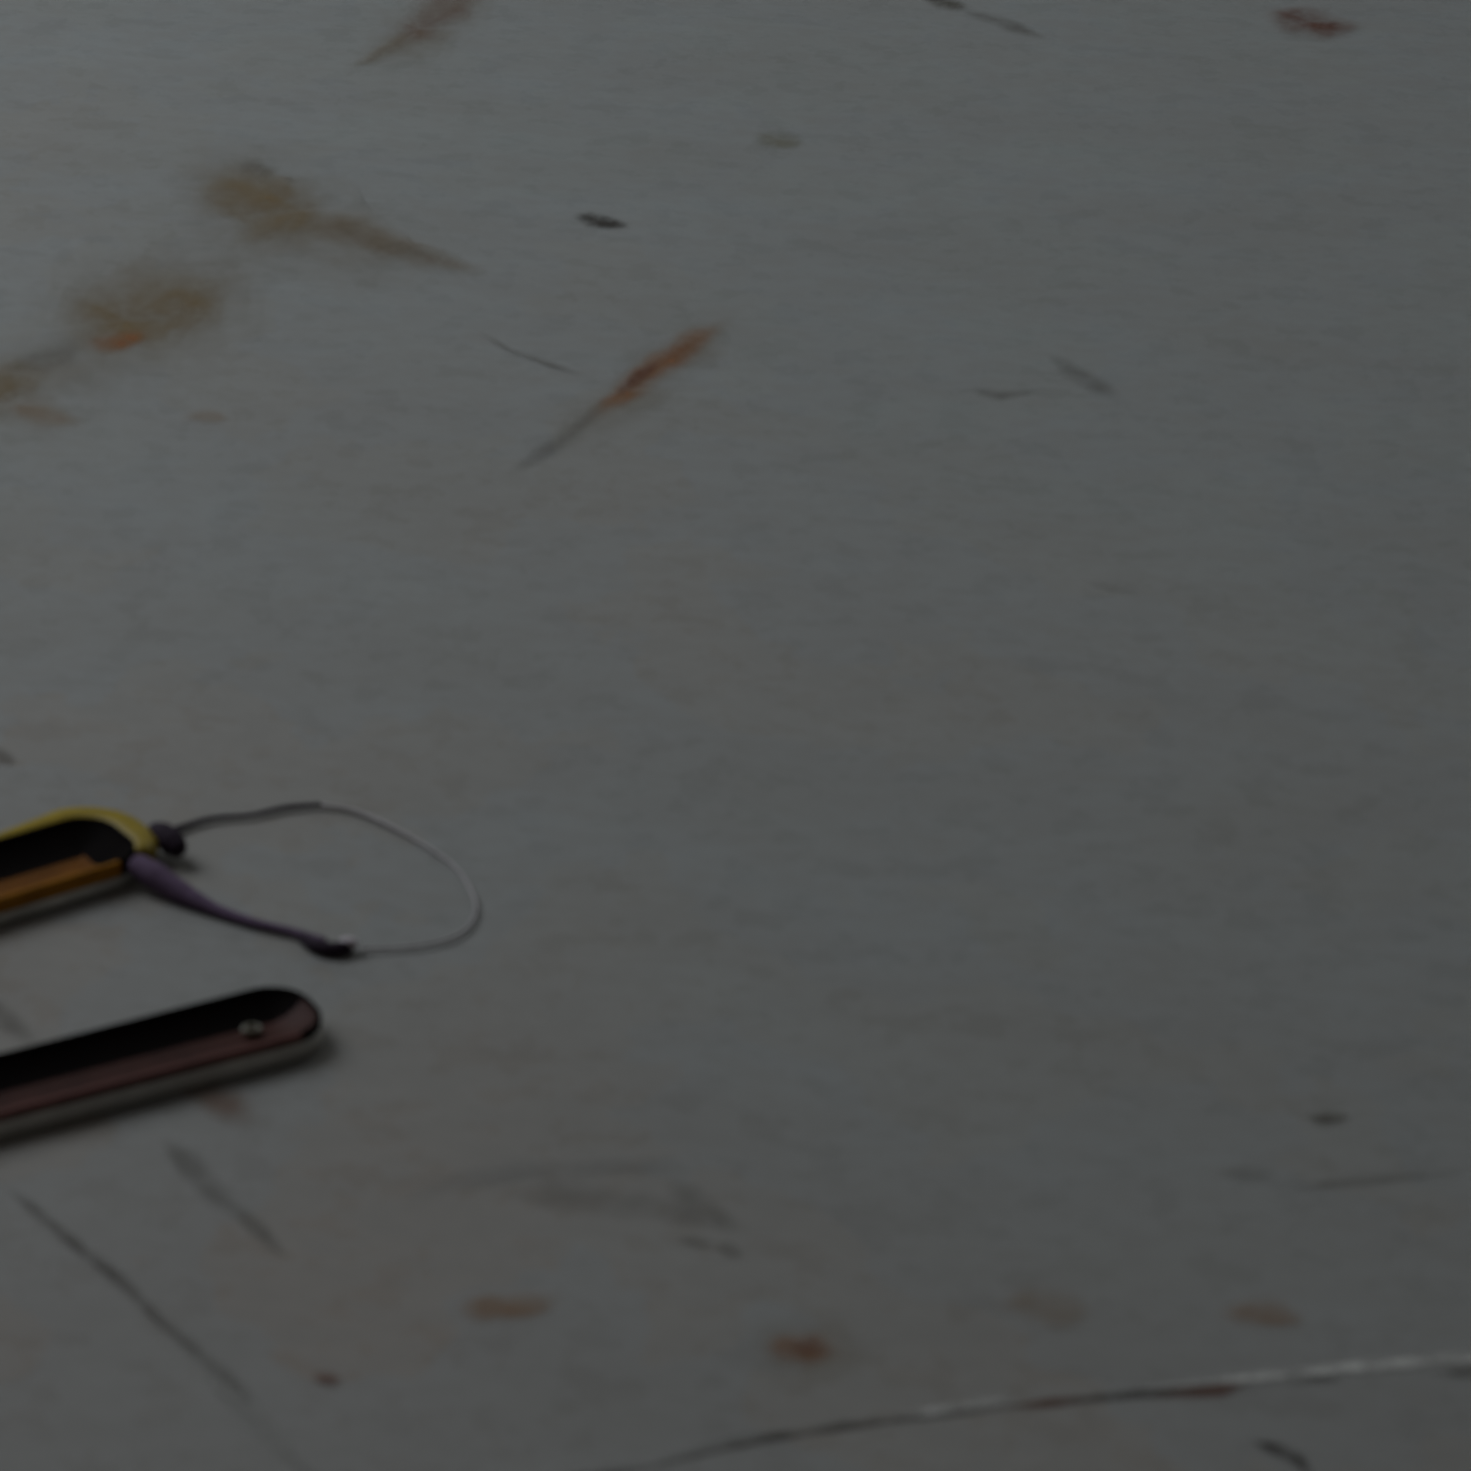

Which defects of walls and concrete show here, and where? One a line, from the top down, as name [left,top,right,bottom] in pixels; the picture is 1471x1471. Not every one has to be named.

crack [1038,1353,1471,1405]